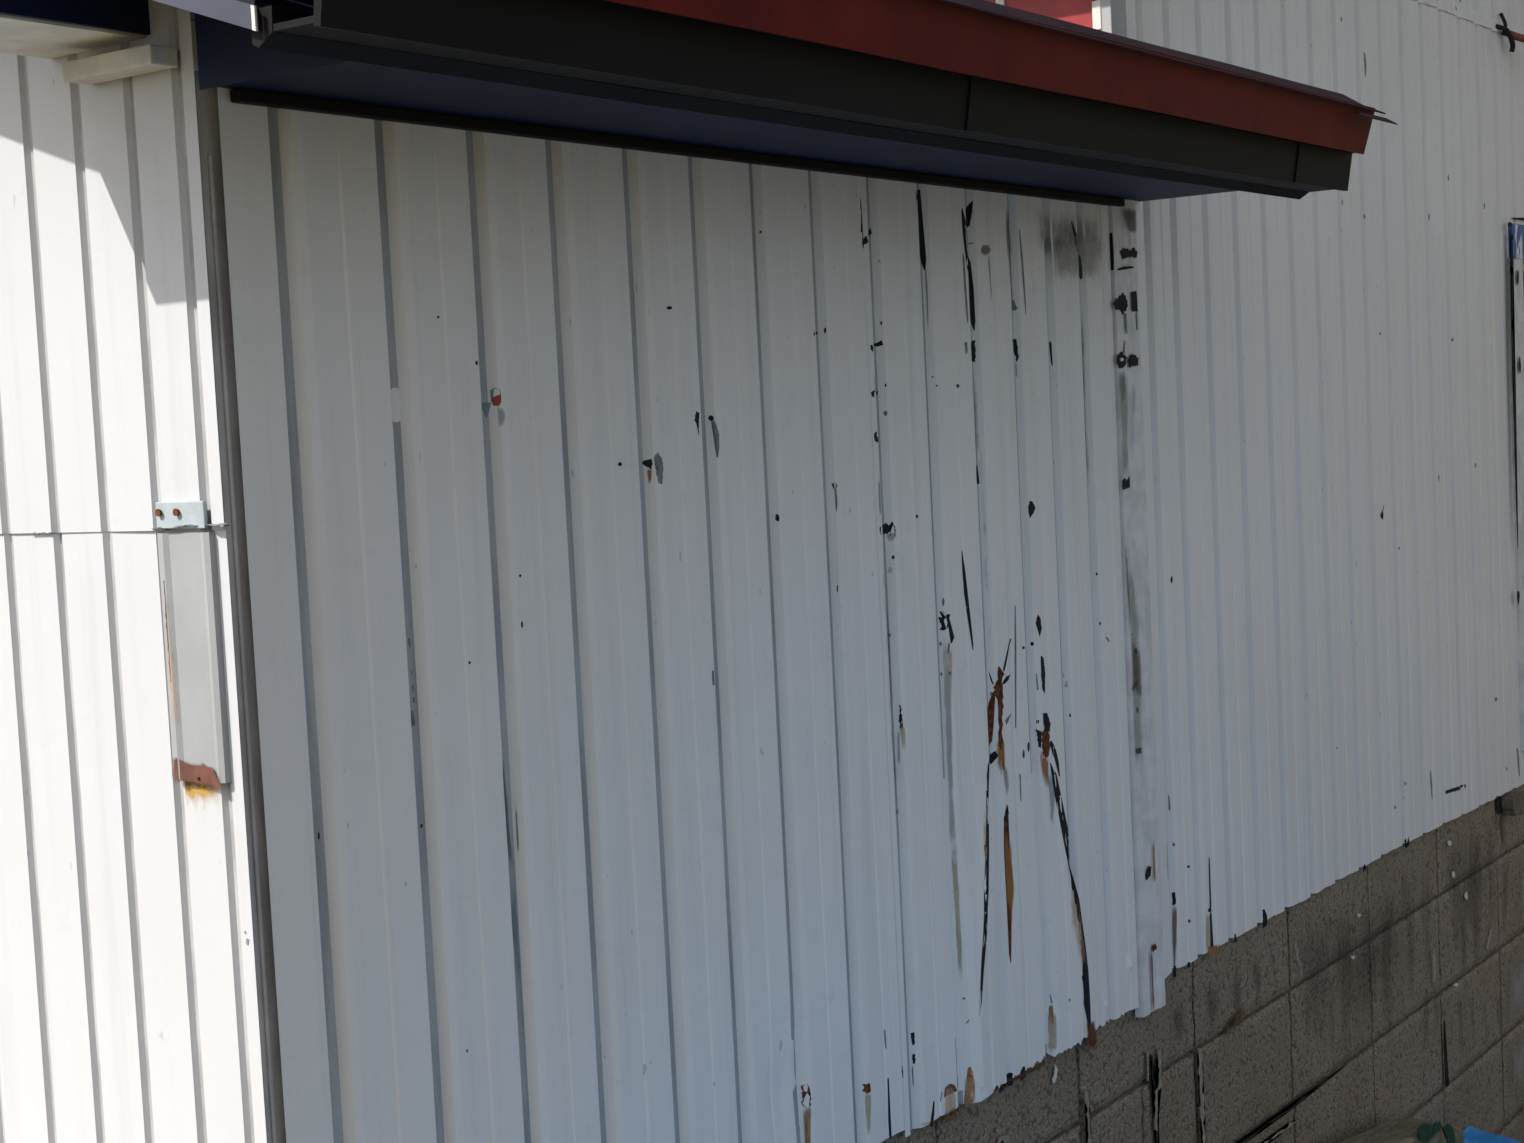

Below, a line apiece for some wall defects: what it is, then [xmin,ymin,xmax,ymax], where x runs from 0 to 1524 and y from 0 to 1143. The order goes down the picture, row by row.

damp [1132,646,1142,713]
corrosion [173,758,221,798]
corrosion [1002,994,1070,1088]
corrosion [1087,1022,1099,1047]
corrosion [801,1084,812,1143]
corrosion [929,1067,975,1124]